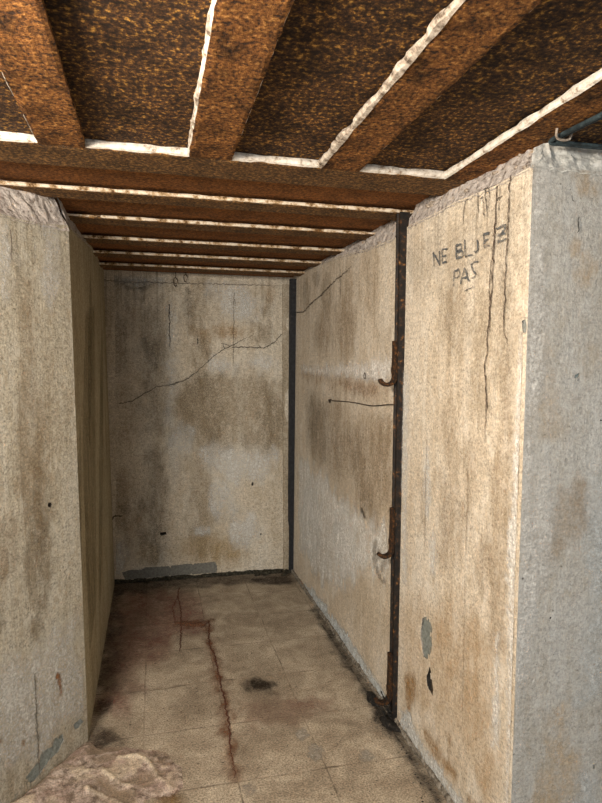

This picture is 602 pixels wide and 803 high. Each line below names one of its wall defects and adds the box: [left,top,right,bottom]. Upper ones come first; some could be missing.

crack [104,279,282,404]
crack [296,269,348,313]
crack [463,176,511,442]
damp [492,300,551,758]
corrosion [175,620,235,737]
flaking render [419,615,433,658]
peeling [25,735,63,786]
damp [401,712,462,803]